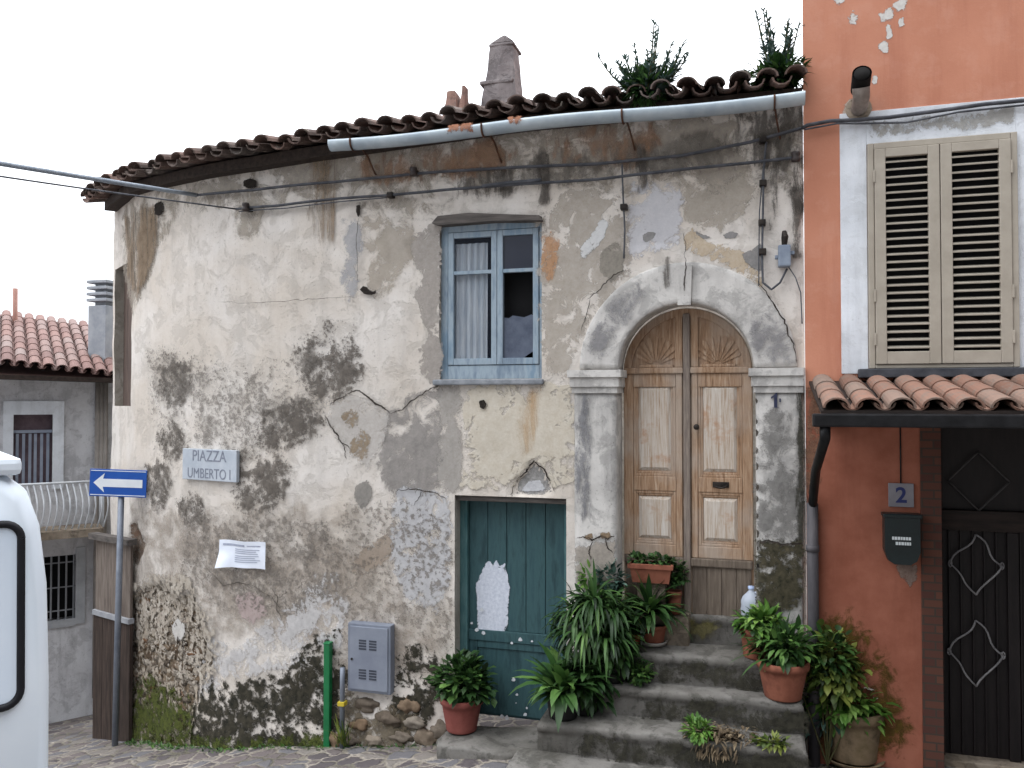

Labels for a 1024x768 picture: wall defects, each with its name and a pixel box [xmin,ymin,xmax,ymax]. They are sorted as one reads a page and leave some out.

peeling [878,0,907,53]
leakage [124,205,157,298]
peeling [122,117,762,383]
crack [581,271,622,331]
crack [758,282,797,362]
crack [325,385,439,458]
leakage [144,320,455,749]
peeling [352,487,453,614]
leakage [753,388,820,614]